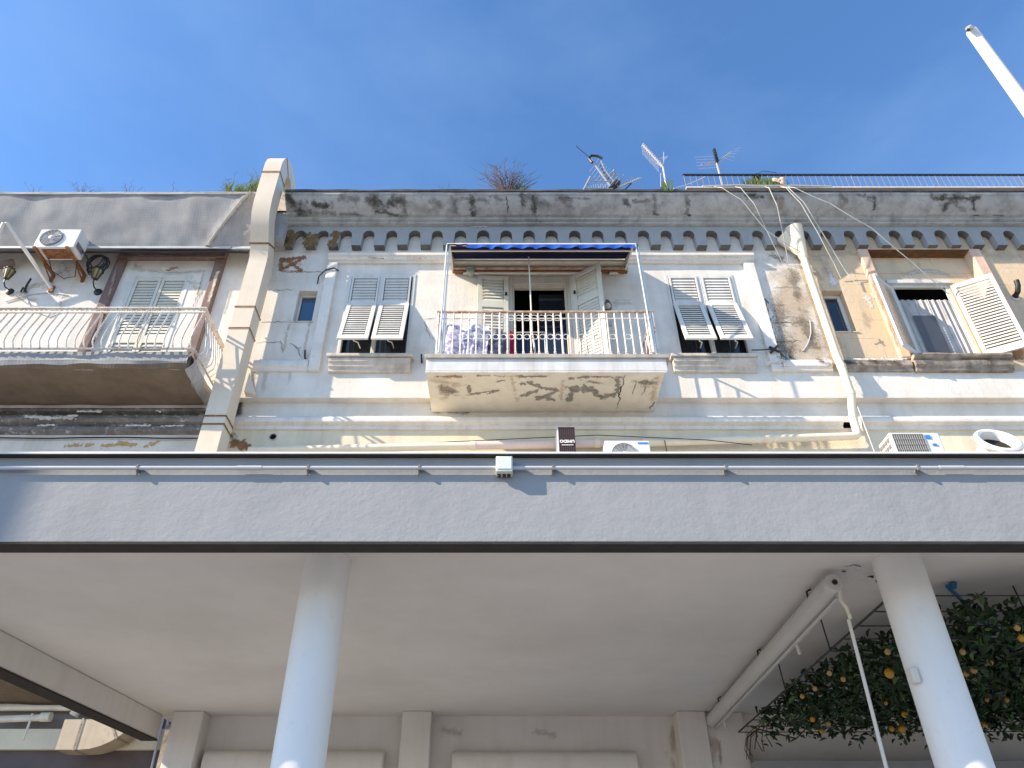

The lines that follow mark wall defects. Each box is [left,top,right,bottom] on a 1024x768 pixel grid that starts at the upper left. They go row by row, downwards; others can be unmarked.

leakage [286,193,341,216]
leakage [341,196,406,217]
leakage [932,194,980,216]
flaking render [278,229,342,272]
leakage [770,254,832,366]
leakage [845,358,907,366]
spalling [518,375,620,402]
crack [617,376,655,408]
flaking render [229,433,251,451]